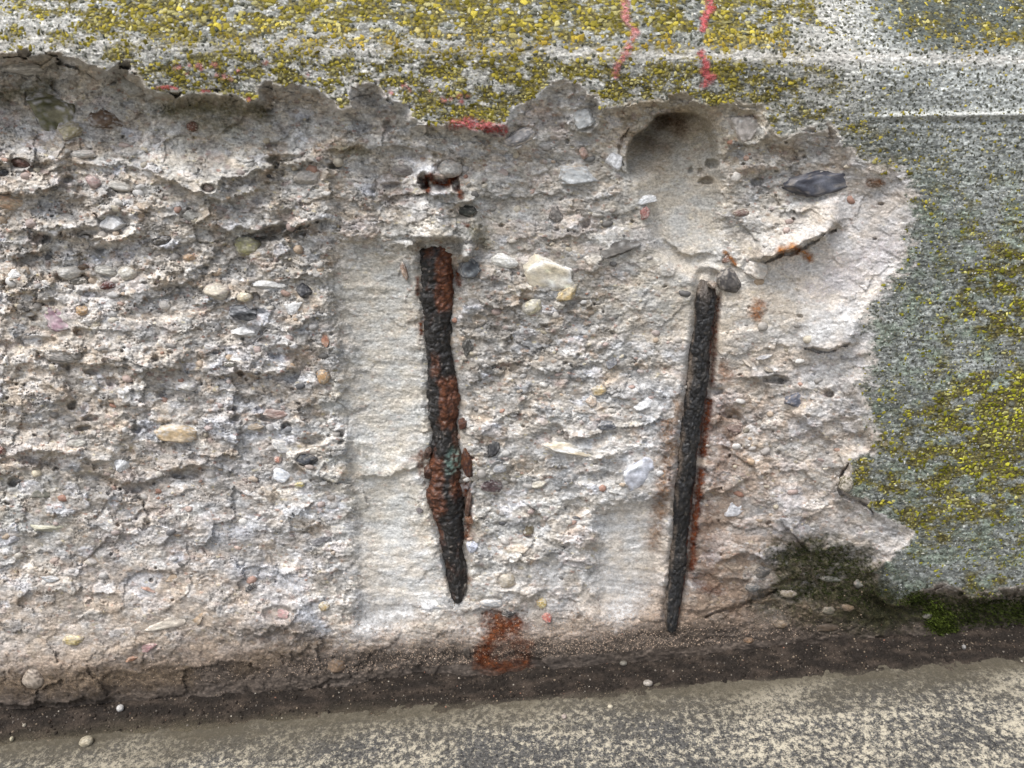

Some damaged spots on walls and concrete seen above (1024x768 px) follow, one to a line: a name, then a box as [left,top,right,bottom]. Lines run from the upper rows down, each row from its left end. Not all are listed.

corrosion [423,173,463,199]
spalling [635,194,657,205]
corrosion [707,280,726,382]
corrosion [418,447,433,479]
corrosion [461,448,473,540]
corrosion [648,400,681,547]
corrosion [688,398,732,571]
spalling [660,570,669,600]
spalling [819,563,865,604]
damp [760,571,1024,629]
corrosion [475,610,529,671]